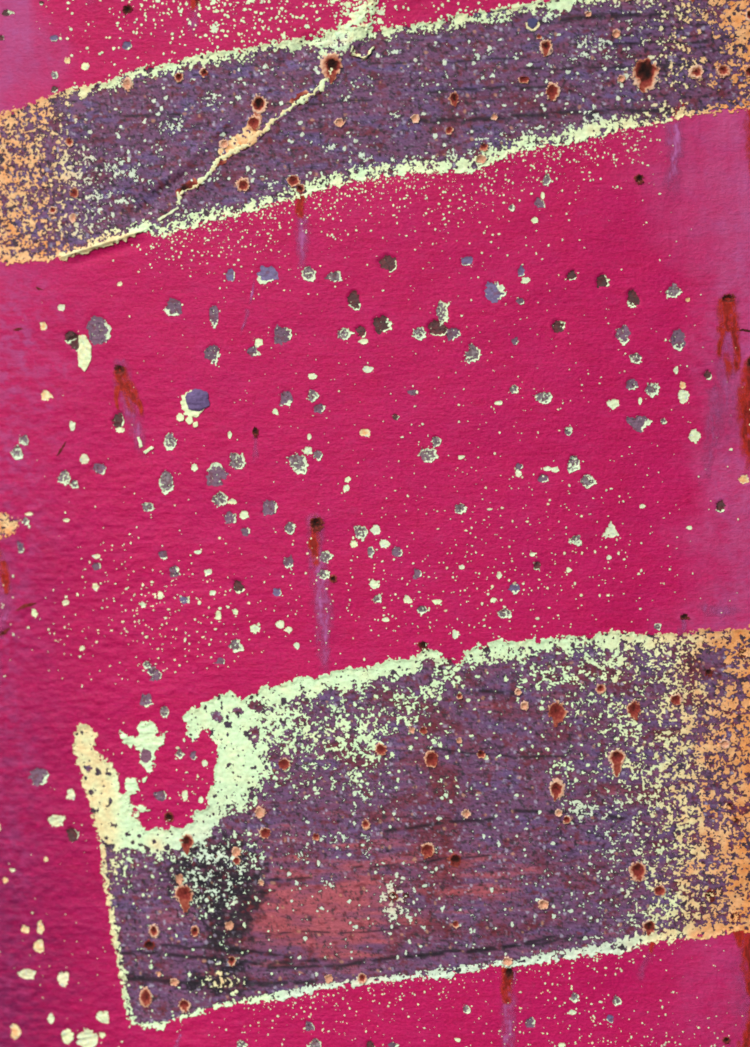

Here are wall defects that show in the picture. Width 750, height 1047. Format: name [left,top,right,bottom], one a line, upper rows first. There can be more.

crack [158,68,333,221]
peeling [0,0,750,266]
peeling [65,315,112,371]
rust [114,367,143,436]
rust [717,298,750,463]
peeling [191,453,250,536]
peeling [538,455,597,489]
peeling [350,525,403,558]
rust [308,516,331,663]
peeling [66,614,750,1031]
rust [733,928,750,996]
rust [738,1012,750,1047]